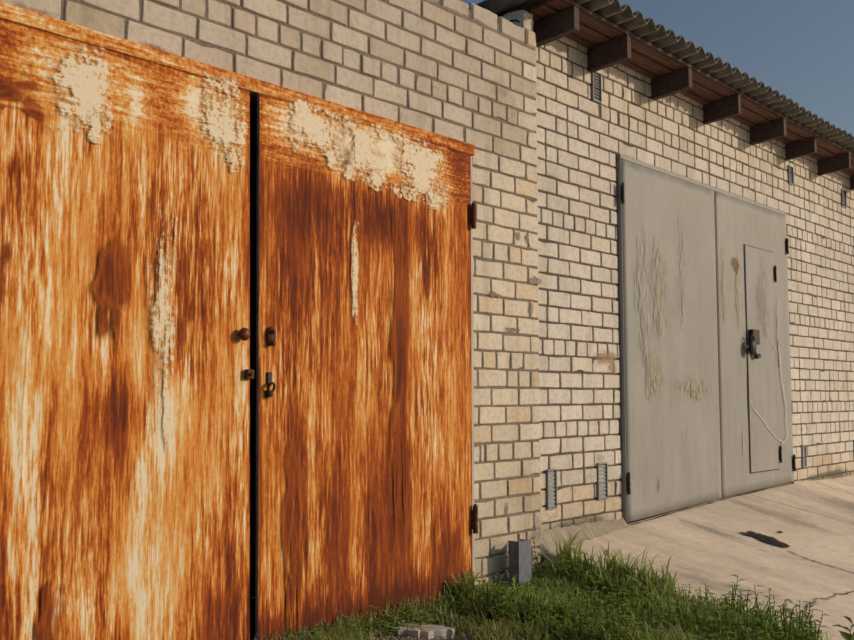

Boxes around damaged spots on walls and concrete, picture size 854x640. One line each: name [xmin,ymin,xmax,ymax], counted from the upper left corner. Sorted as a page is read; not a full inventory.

rust [0,72,46,120]
peeling [51,45,115,144]
peeling [201,72,247,173]
peeling [286,96,451,211]
rust [0,241,11,309]
rust [91,235,132,340]
peeling [149,211,178,453]
rust [389,211,411,536]
rust [282,437,310,631]
rust [35,578,66,640]
crack [759,549,854,629]